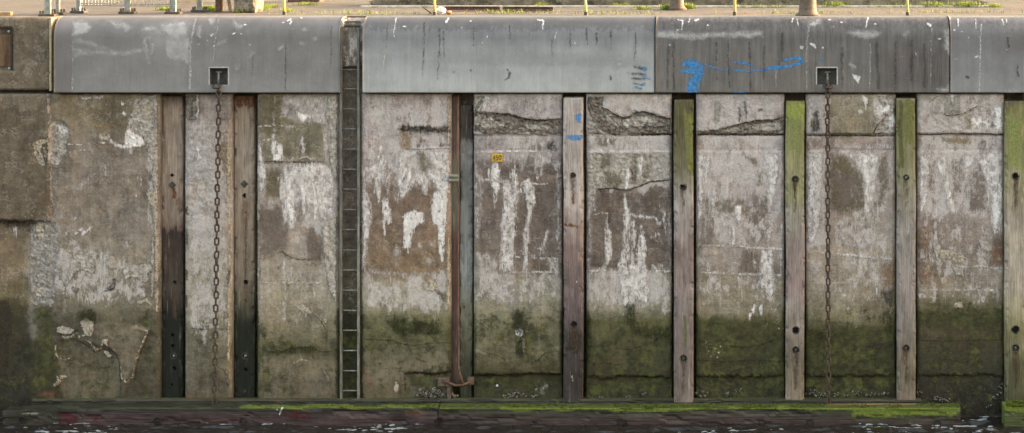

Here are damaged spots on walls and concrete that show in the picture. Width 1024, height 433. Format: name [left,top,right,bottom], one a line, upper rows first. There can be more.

spalling [474,96,562,134]
spalling [587,96,672,136]
spalling [698,117,784,136]
leakage [361,96,451,293]
leakage [474,143,562,303]
leakage [576,193,672,316]
peeling [55,309,148,395]
leakage [515,313,527,357]